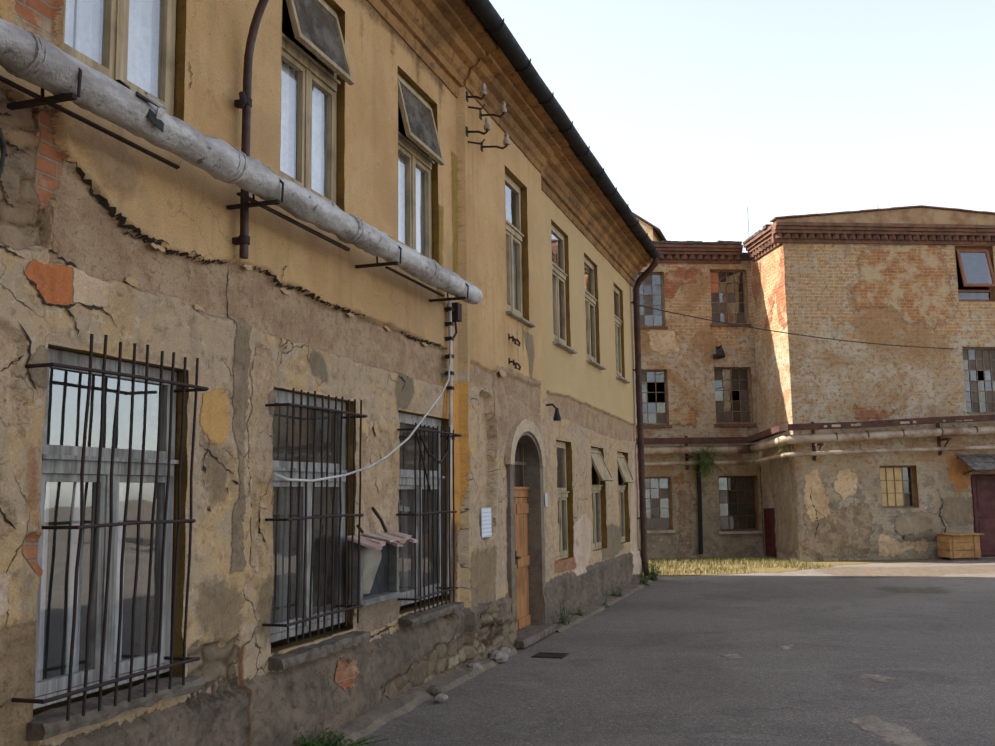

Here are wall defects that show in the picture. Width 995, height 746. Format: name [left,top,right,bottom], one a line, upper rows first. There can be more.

flaking render [0,0,64,50]
crack [63,159,366,324]
crack [0,245,118,339]
spalling [0,88,498,543]
crack [2,321,38,392]
crack [0,508,16,529]
flaking render [22,531,43,575]
flaking render [802,468,930,561]
crack [937,490,951,533]
flaking render [335,655,360,691]